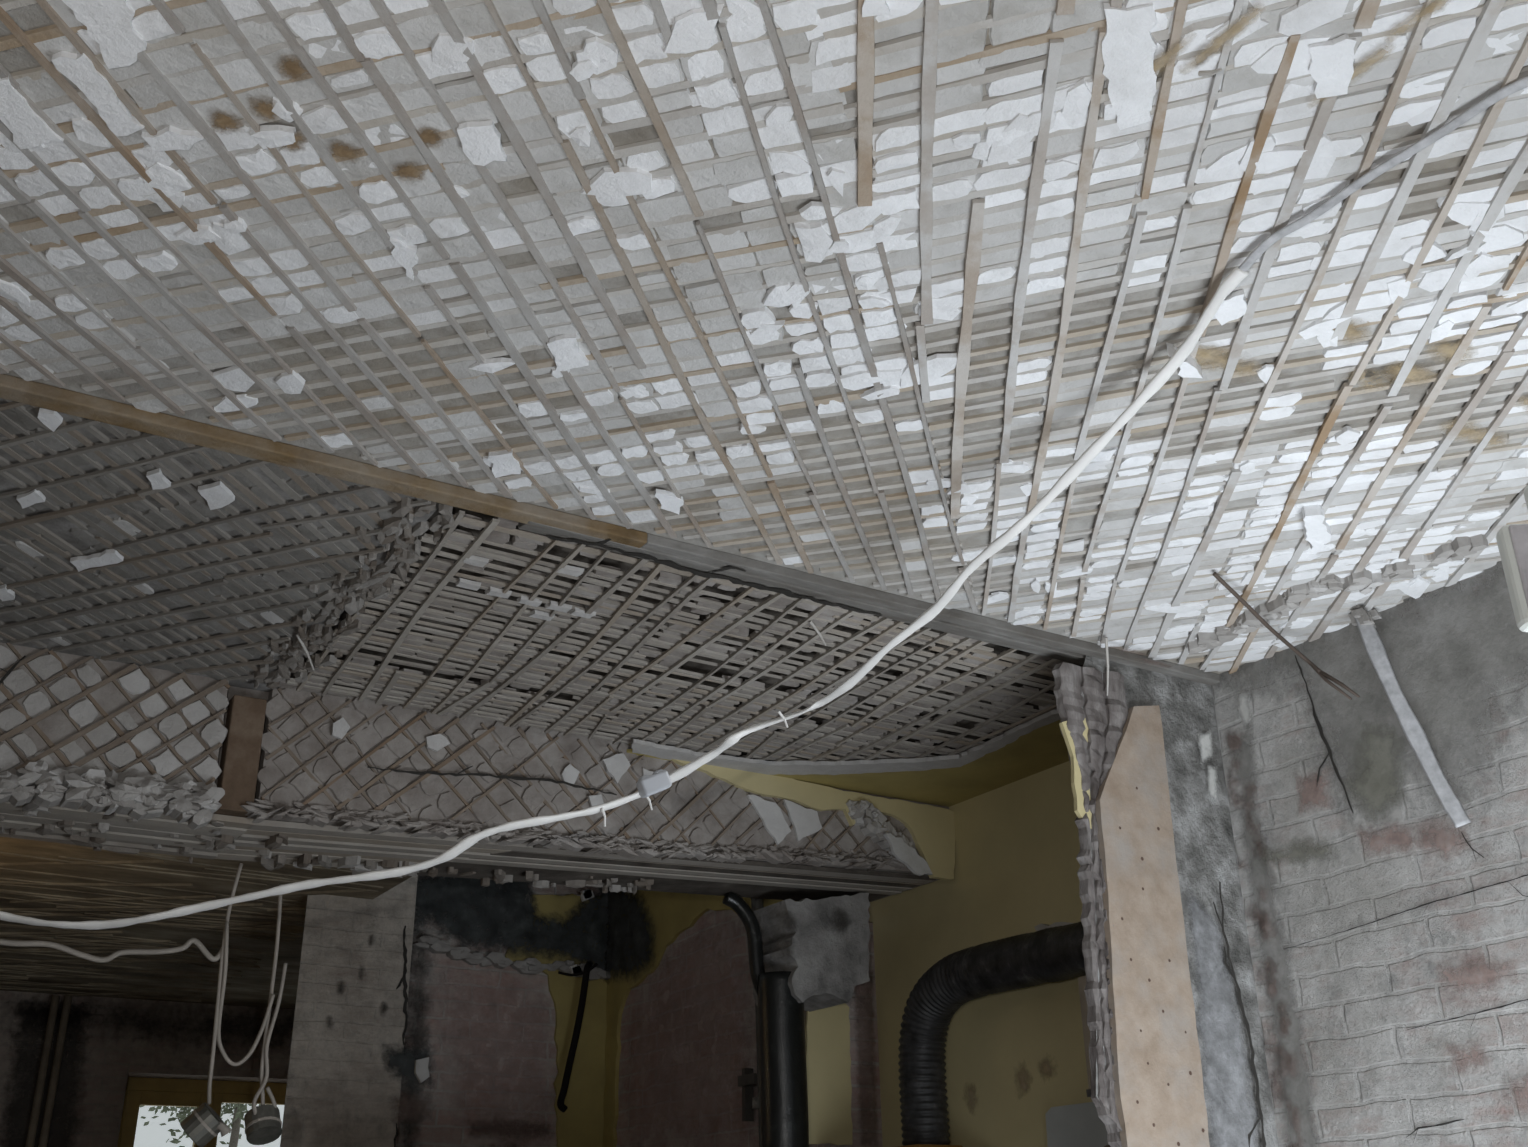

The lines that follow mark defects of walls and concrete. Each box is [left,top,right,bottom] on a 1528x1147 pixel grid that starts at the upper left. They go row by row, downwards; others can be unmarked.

flaking render [51,0,204,151]
flaking render [1102,3,1157,130]
flaking render [1308,34,1357,99]
flaking render [0,76,64,149]
flaking render [457,120,507,166]
flaking render [1214,289,1247,325]
flaking render [198,481,235,510]
flaking render [455,556,596,621]
crack [1295,655,1353,813]
spalling [602,662,1128,1147]
crack [1284,832,1528,950]
crack [1408,999,1528,1030]